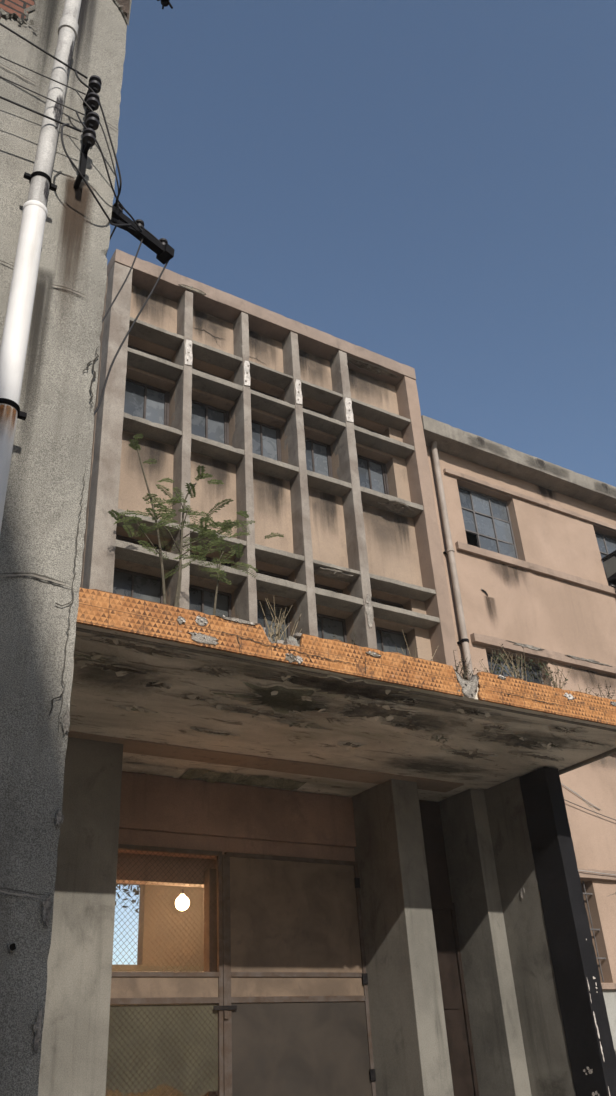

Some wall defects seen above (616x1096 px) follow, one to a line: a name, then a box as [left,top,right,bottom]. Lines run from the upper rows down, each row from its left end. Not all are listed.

crack [83,346,99,409]
crack [0,463,86,740]
peeling [449,669,502,717]
flaking render [440,725,613,761]